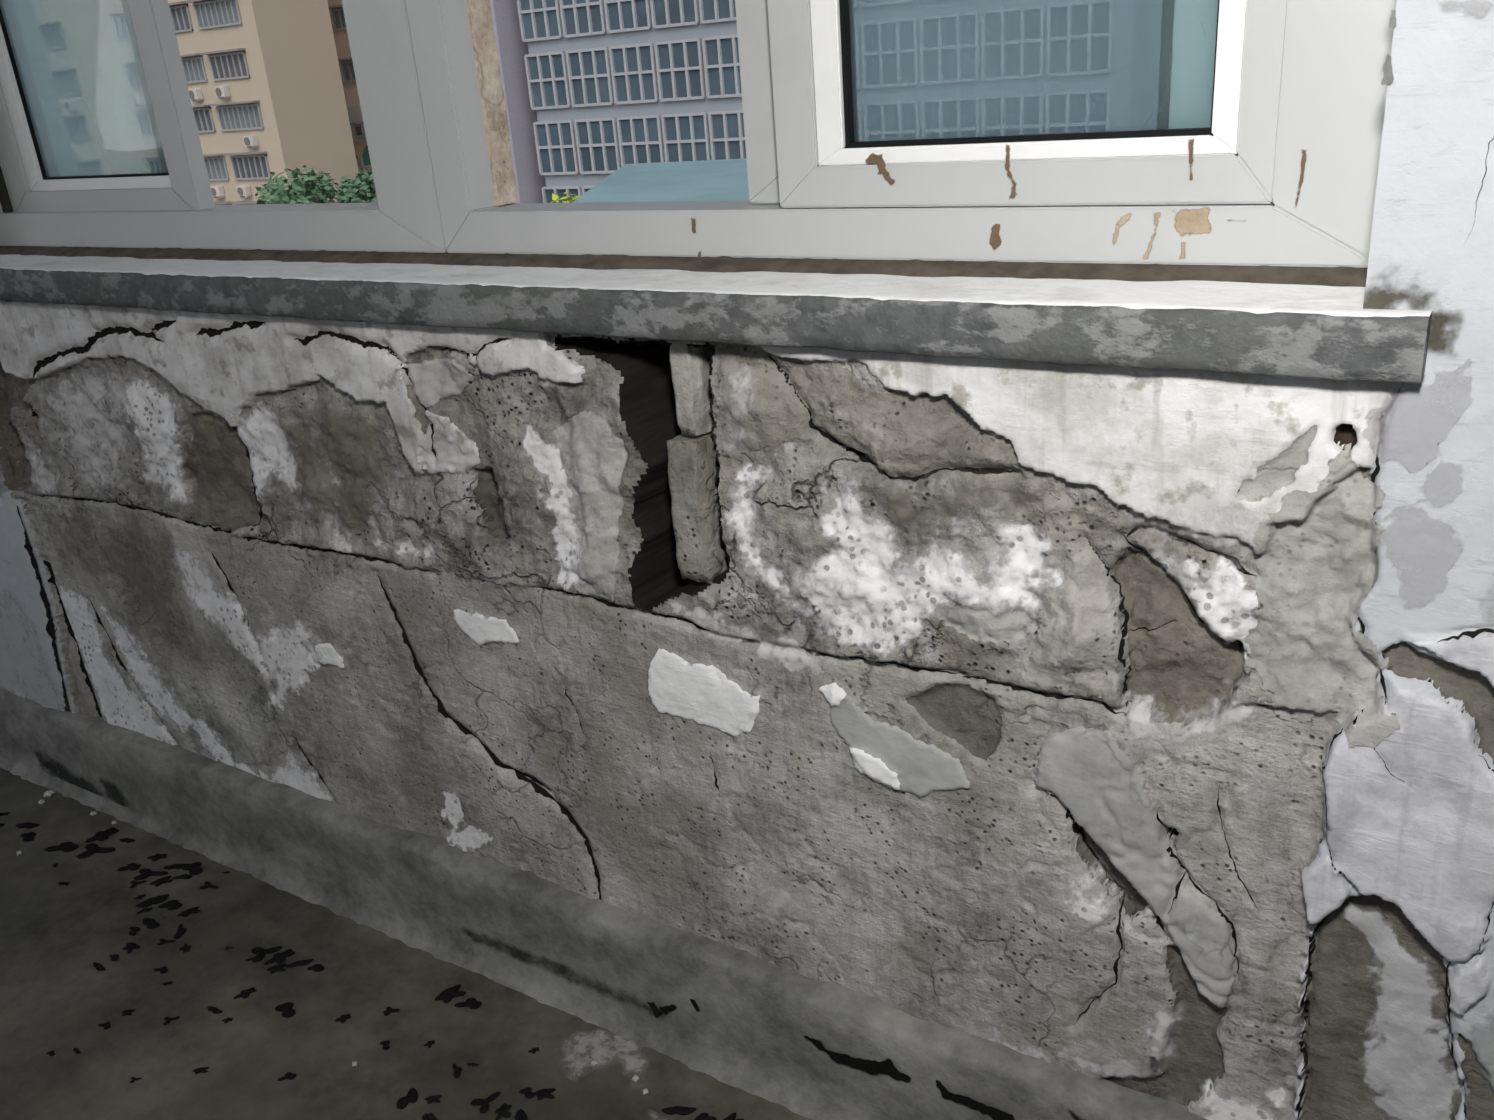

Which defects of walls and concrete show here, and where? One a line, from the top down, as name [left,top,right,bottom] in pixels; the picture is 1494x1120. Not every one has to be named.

rust [866,153,895,185]
rust [989,224,1002,250]
rust [1005,145,1016,198]
rust [1113,213,1132,244]
rust [1143,207,1211,259]
damp [1363,287,1460,351]
crack [33,320,436,457]
crack [767,352,1017,482]
crack [1371,387,1401,572]
crack [0,441,601,900]
flaking render [0,300,1494,1120]
crack [533,525,1256,714]